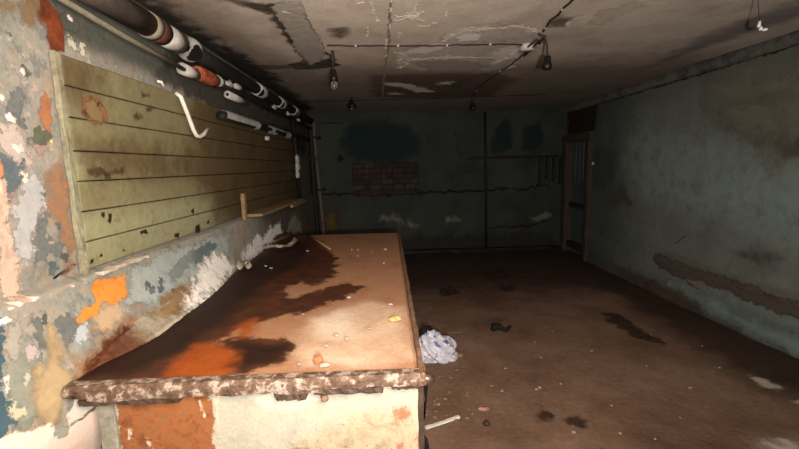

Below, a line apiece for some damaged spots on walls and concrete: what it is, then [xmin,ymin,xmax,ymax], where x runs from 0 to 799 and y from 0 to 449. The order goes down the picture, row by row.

peeling [59,9,86,57]
crack [315,0,401,102]
leakage [670,6,799,59]
leakage [705,61,799,163]
crack [322,184,551,198]
peeling [0,85,103,449]
peeling [84,232,230,369]
flaking render [263,237,299,249]
flaking render [653,253,799,319]